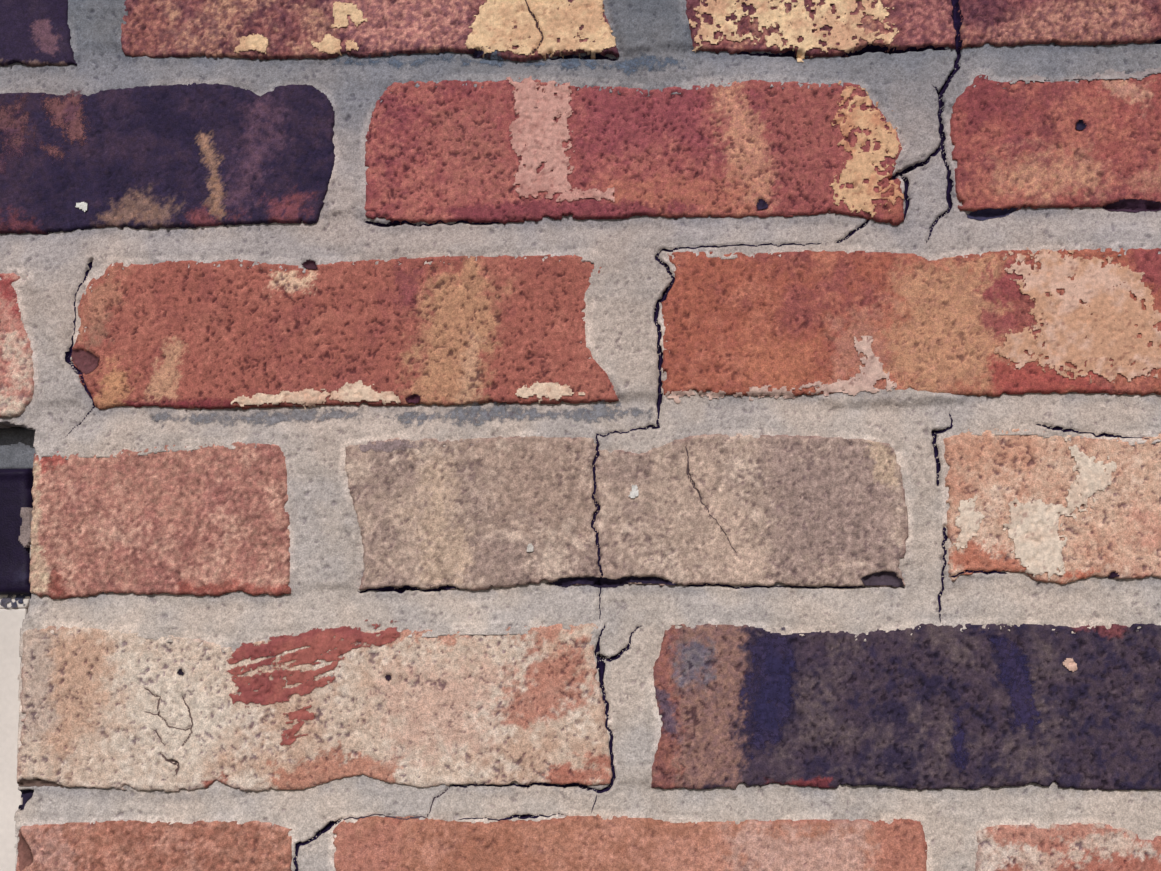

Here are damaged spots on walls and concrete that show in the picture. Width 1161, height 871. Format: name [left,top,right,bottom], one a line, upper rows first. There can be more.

peeling [234,33,268,54]
peeling [311,1,367,55]
peeling [465,0,616,60]
peeling [689,0,899,62]
peeling [829,81,905,217]
crack [842,0,964,243]
crack [65,261,95,437]
peeling [994,248,1161,383]
crack [932,414,953,486]
crack [293,219,869,871]